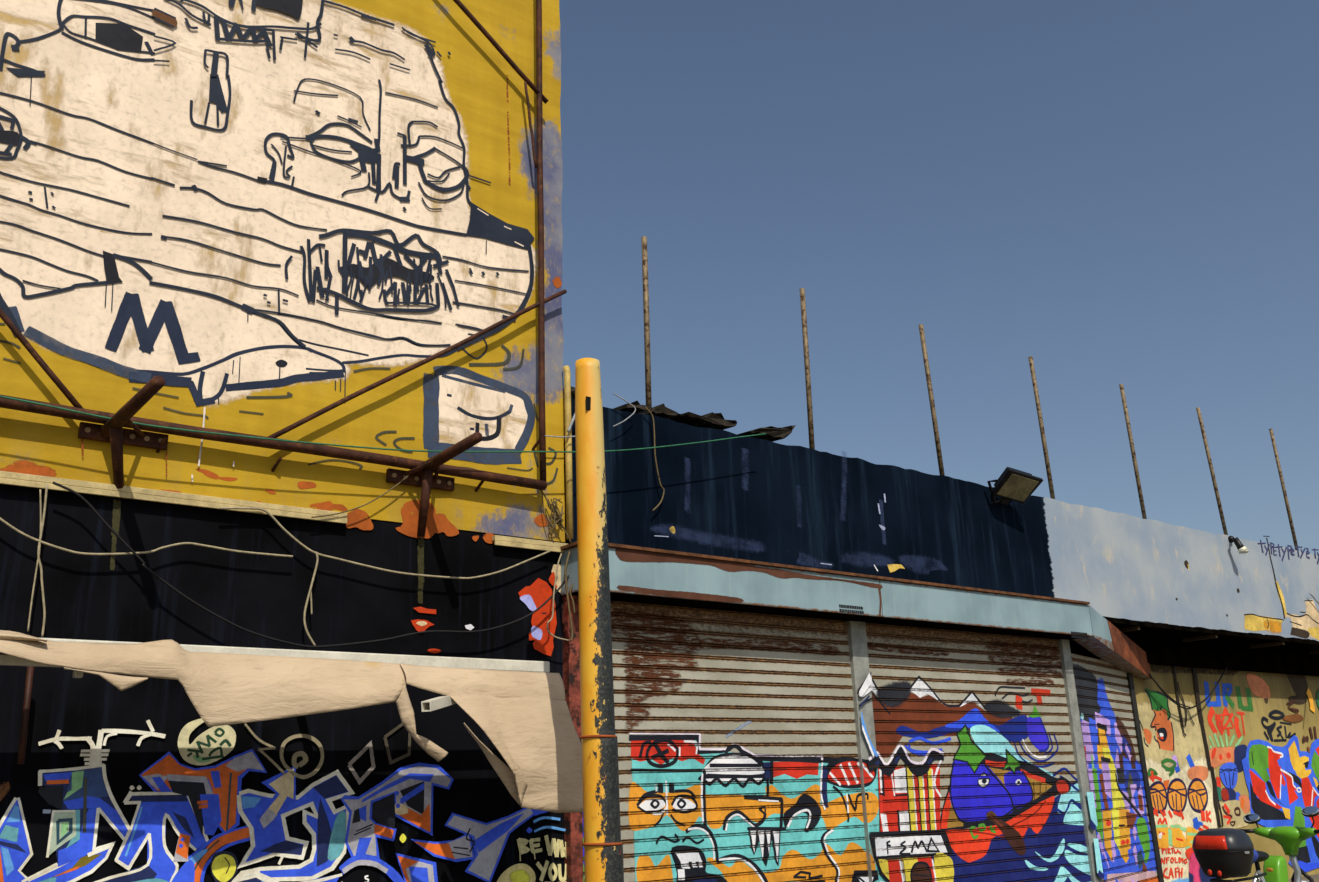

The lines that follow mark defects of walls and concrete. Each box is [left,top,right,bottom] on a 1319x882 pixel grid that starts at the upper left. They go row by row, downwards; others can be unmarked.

peeling [396,500,494,544]
peeling [534,514,549,527]
peeling [518,564,561,656]
rust [615,548,883,615]
spalling [1244,599,1319,640]
rust [611,608,840,734]